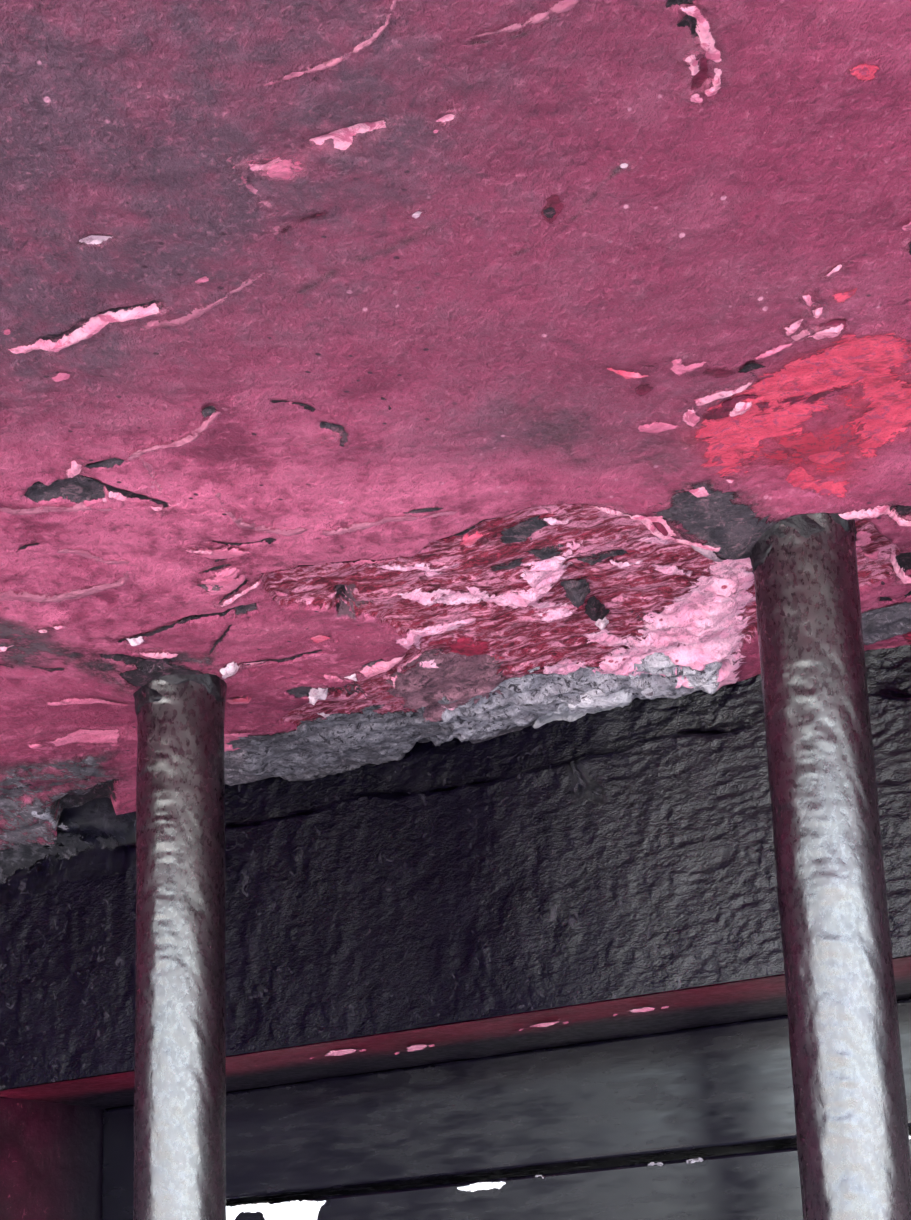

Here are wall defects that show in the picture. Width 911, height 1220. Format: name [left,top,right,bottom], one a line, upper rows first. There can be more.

spalling [665,0,722,103]
peeling [309,120,387,150]
peeling [246,156,302,179]
peeling [4,300,163,354]
peeling [607,363,656,396]
peeling [638,288,911,498]
spalling [838,504,911,587]
crack [879,591,911,601]
spalling [186,503,758,726]
peeling [47,698,128,706]
peeling [29,729,121,748]
peeling [226,1200,326,1220]